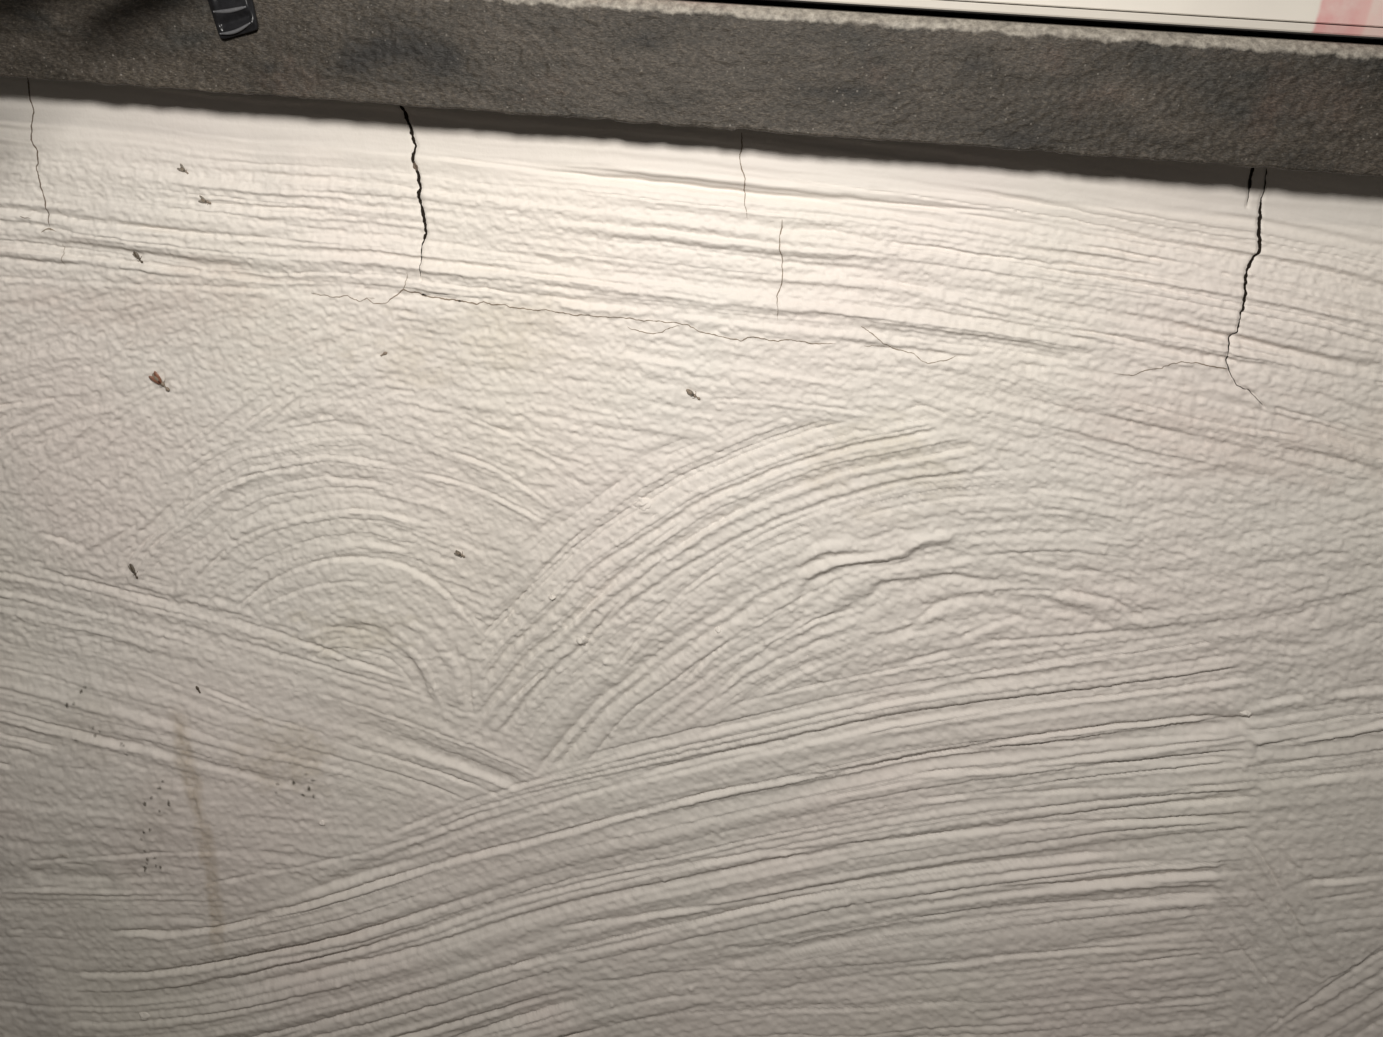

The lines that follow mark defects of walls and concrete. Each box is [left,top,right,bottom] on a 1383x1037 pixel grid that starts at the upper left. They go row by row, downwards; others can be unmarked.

crack [20,78,65,261]
crack [313,106,832,344]
crack [861,326,955,364]
crack [1121,168,1267,407]